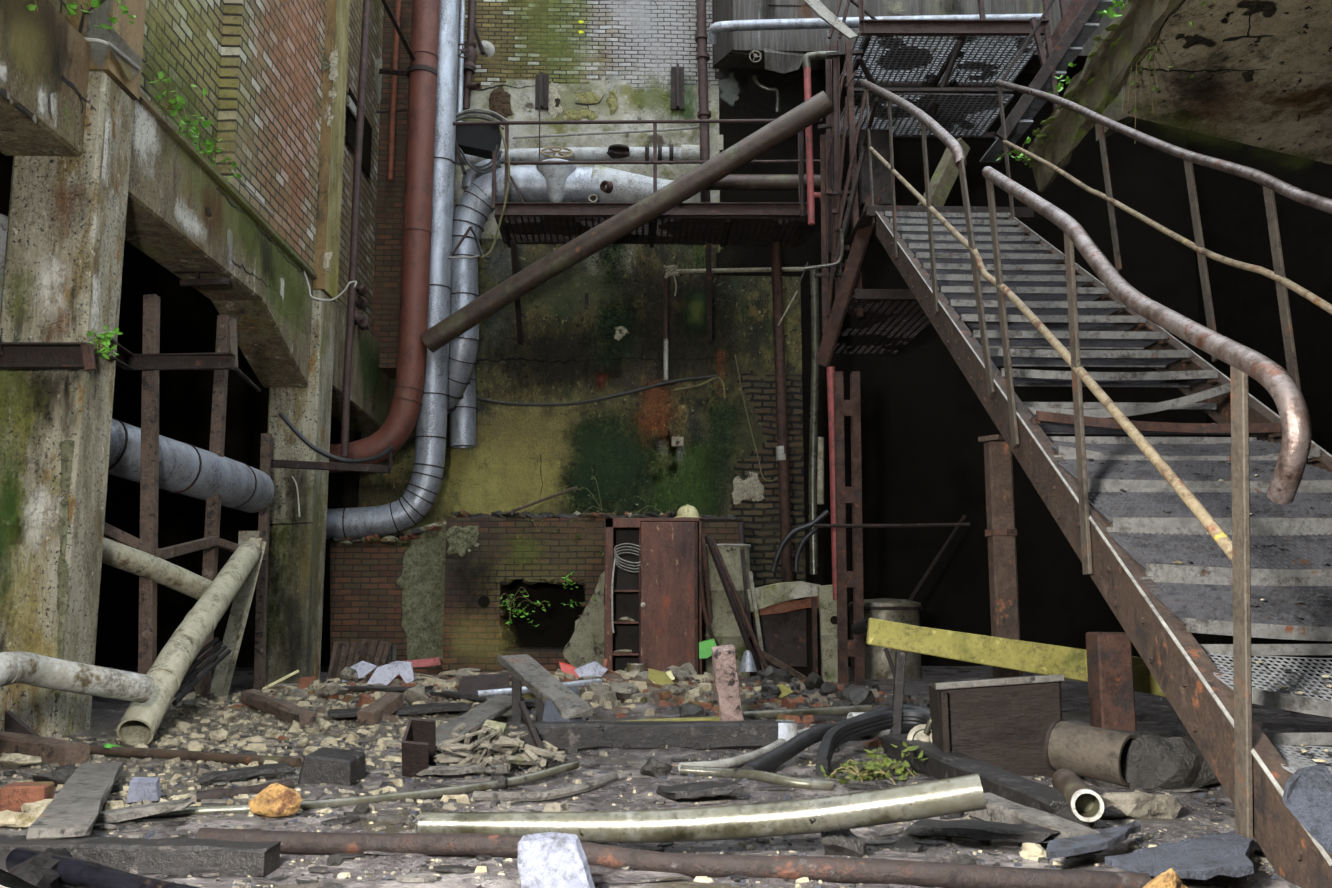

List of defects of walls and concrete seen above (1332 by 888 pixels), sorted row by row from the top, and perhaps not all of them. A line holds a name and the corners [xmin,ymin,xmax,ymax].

crack [1142,16,1274,73]
efflorescence [175,203,206,240]
water stain [259,237,284,298]
spalling [732,471,764,505]
spalling [396,511,526,662]
spalling [494,571,605,668]